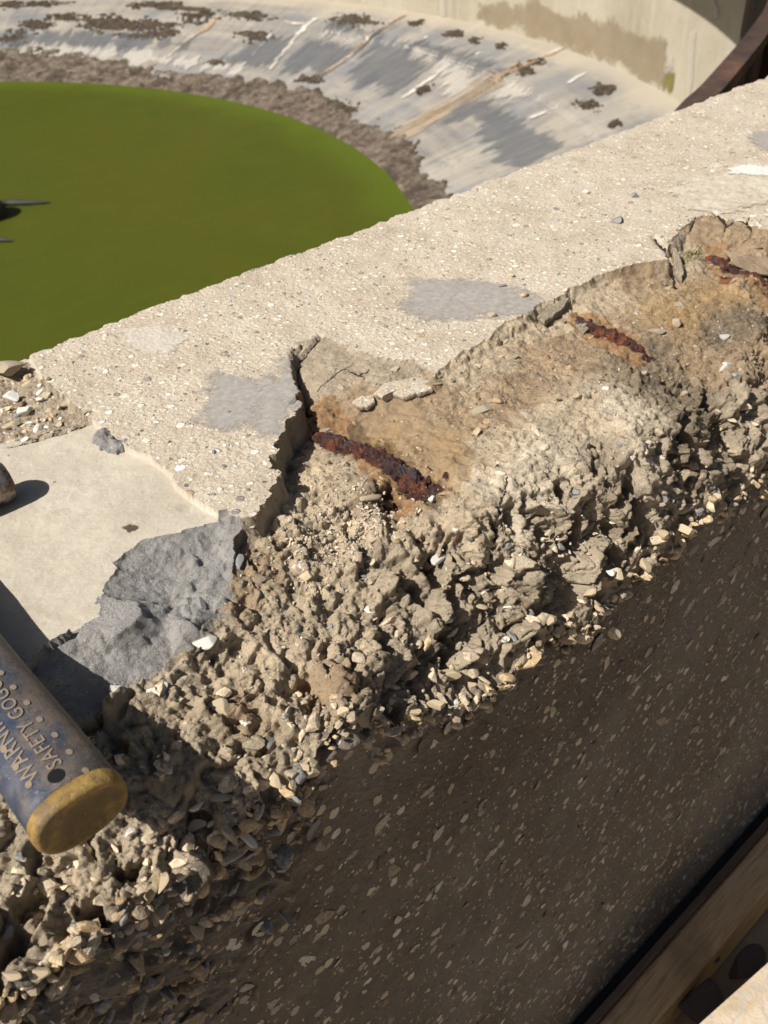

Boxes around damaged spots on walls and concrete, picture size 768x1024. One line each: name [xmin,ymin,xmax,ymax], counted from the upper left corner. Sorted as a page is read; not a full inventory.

corrosion [569,311,654,371]
corrosion [701,242,768,311]
corrosion [301,395,450,524]
spalling [0,215,768,1024]